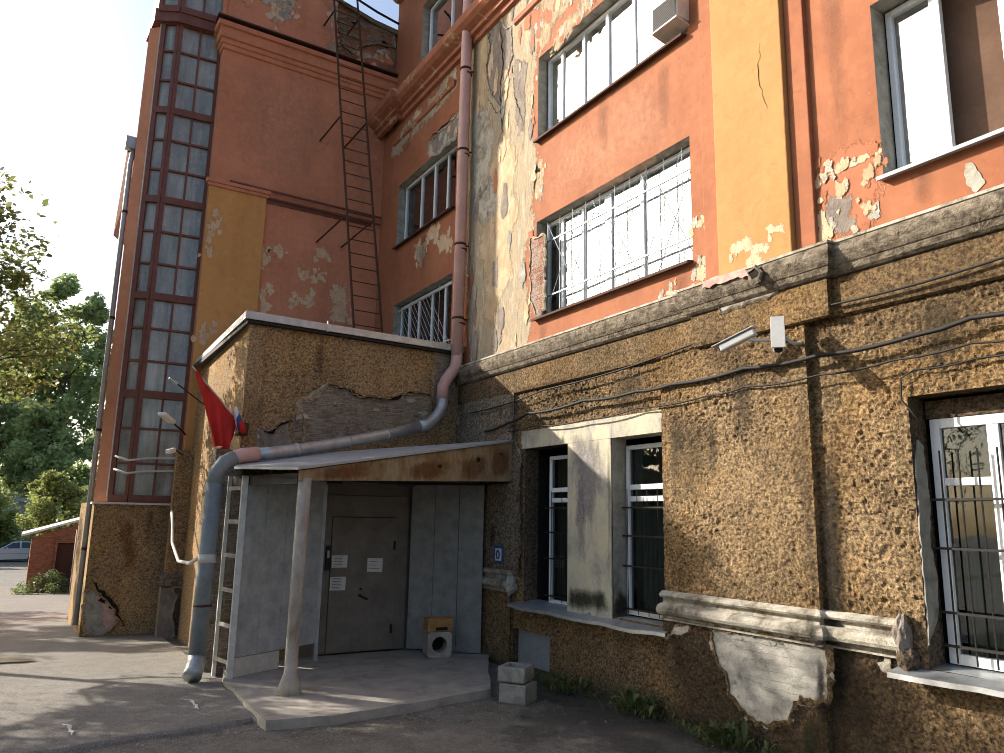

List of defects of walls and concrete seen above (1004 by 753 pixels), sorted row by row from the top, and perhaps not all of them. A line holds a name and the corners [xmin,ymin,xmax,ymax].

peeling [391,67,458,158]
peeling [427,0,596,362]
peeling [814,139,888,242]
peeling [288,246,355,325]
peeling [414,220,453,268]
peeling [729,223,785,266]
flaking render [256,352,458,448]
peeling [455,403,523,586]
leakage [574,440,600,545]
crack [91,579,125,627]
mould [569,590,605,609]
spalling [709,626,836,731]